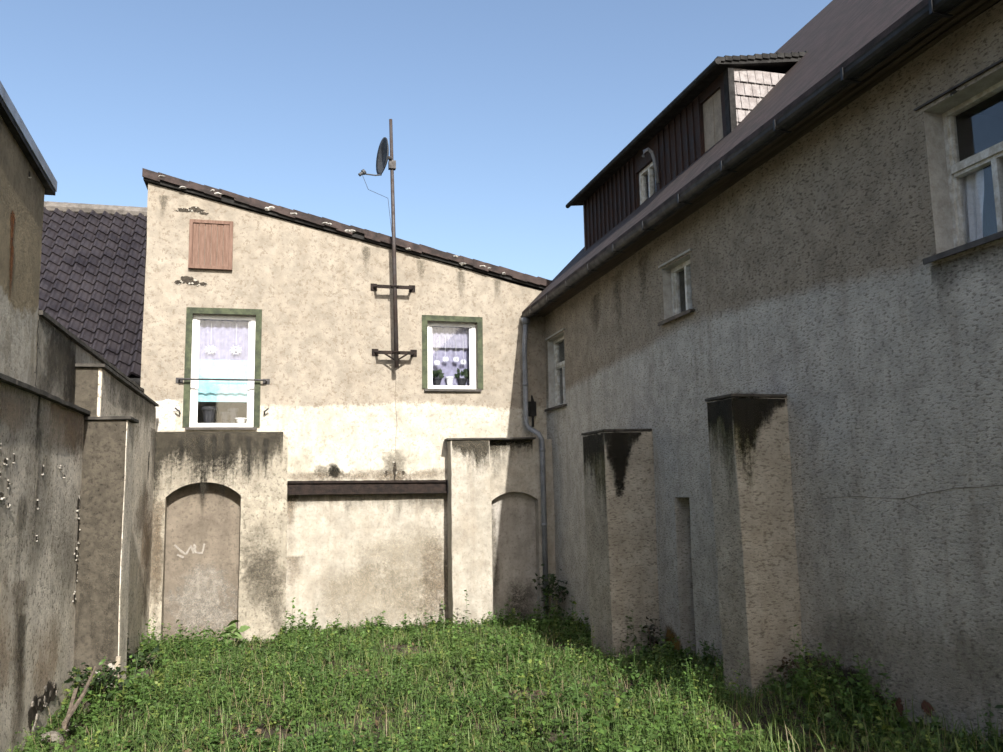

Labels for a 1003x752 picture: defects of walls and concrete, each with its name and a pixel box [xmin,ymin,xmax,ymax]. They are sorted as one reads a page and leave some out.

damp [707,392,785,465]
damp [148,432,283,495]
damp [583,431,641,503]
crack [823,485,1003,524]
spalling [28,681,58,732]